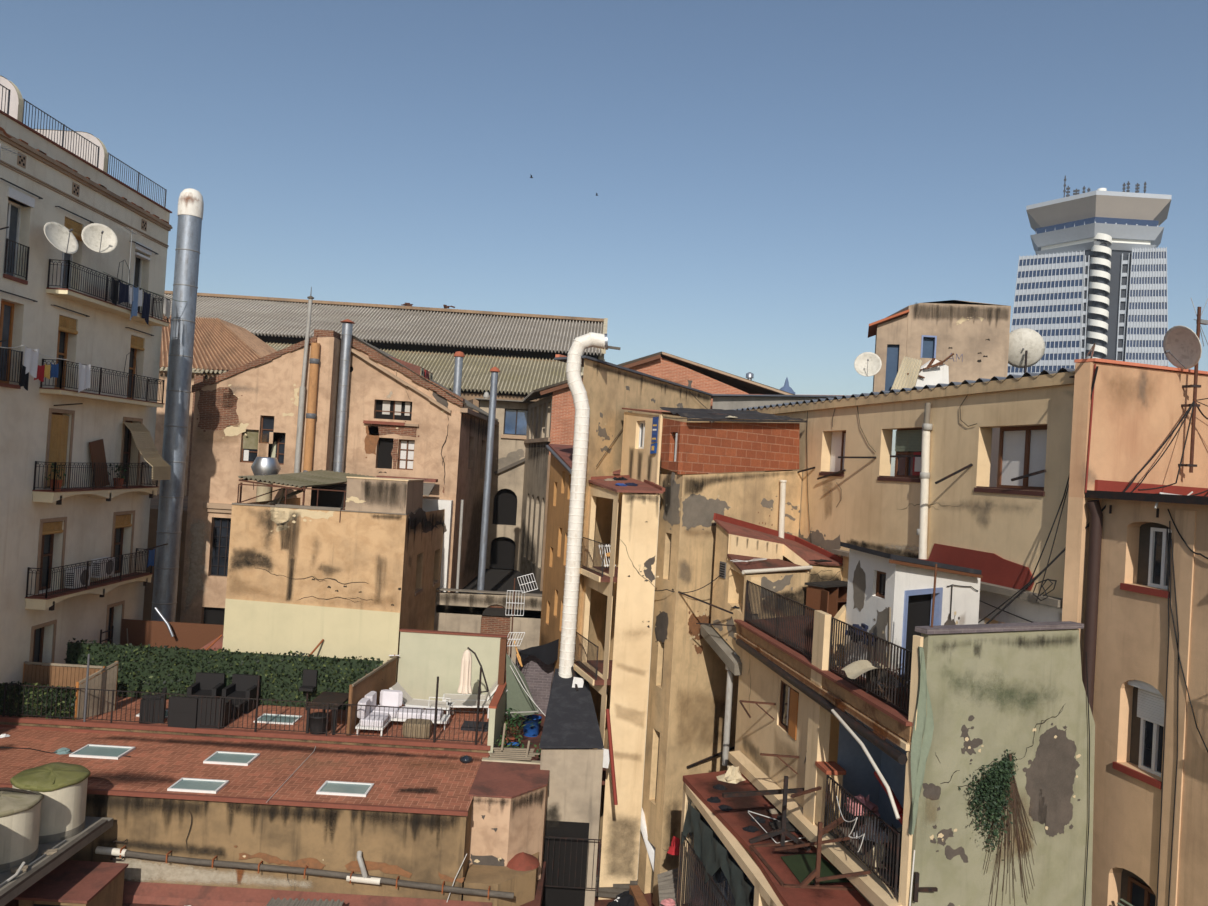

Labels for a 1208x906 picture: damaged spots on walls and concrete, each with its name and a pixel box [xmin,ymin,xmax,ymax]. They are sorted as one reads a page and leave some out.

flaking render [197,384,249,438]
peeling [663,472,732,530]
damp [232,550,271,569]
damp [262,514,298,599]
crack [258,568,372,602]
peeling [758,496,888,687]
peeling [1023,723,1081,837]
damp [86,796,206,818]
damp [229,804,336,837]
damp [352,812,452,836]
damp [102,840,304,886]